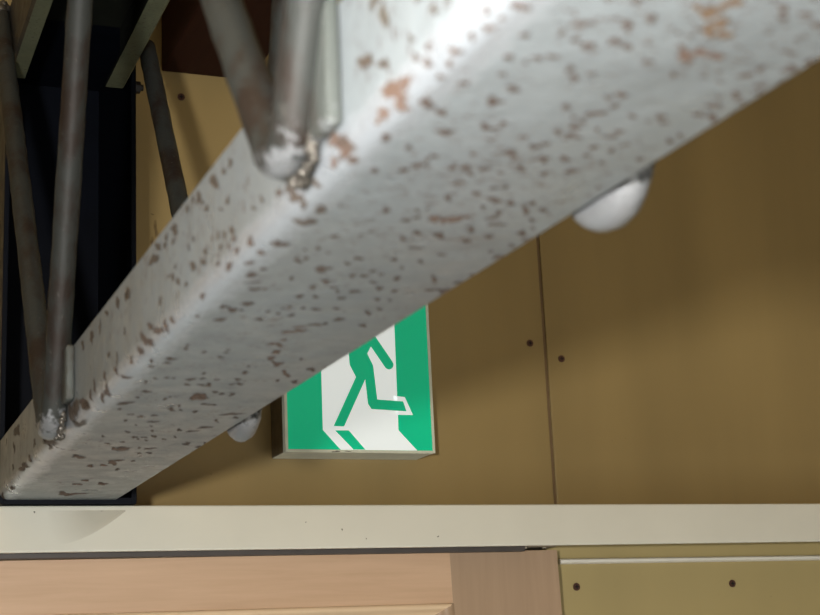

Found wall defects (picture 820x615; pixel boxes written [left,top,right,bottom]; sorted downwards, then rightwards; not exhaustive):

corrosion [676,0,744,63]
corrosion [357,55,388,70]
corrosion [375,76,411,125]
corrosion [419,96,446,117]
corrosion [328,130,359,168]
corrosion [276,184,307,210]
corrosion [295,206,326,226]
corrosion [400,208,474,243]
corrosion [216,227,268,291]
corrosion [255,266,360,384]
corrosion [68,316,250,471]
corrosion [12,439,56,471]